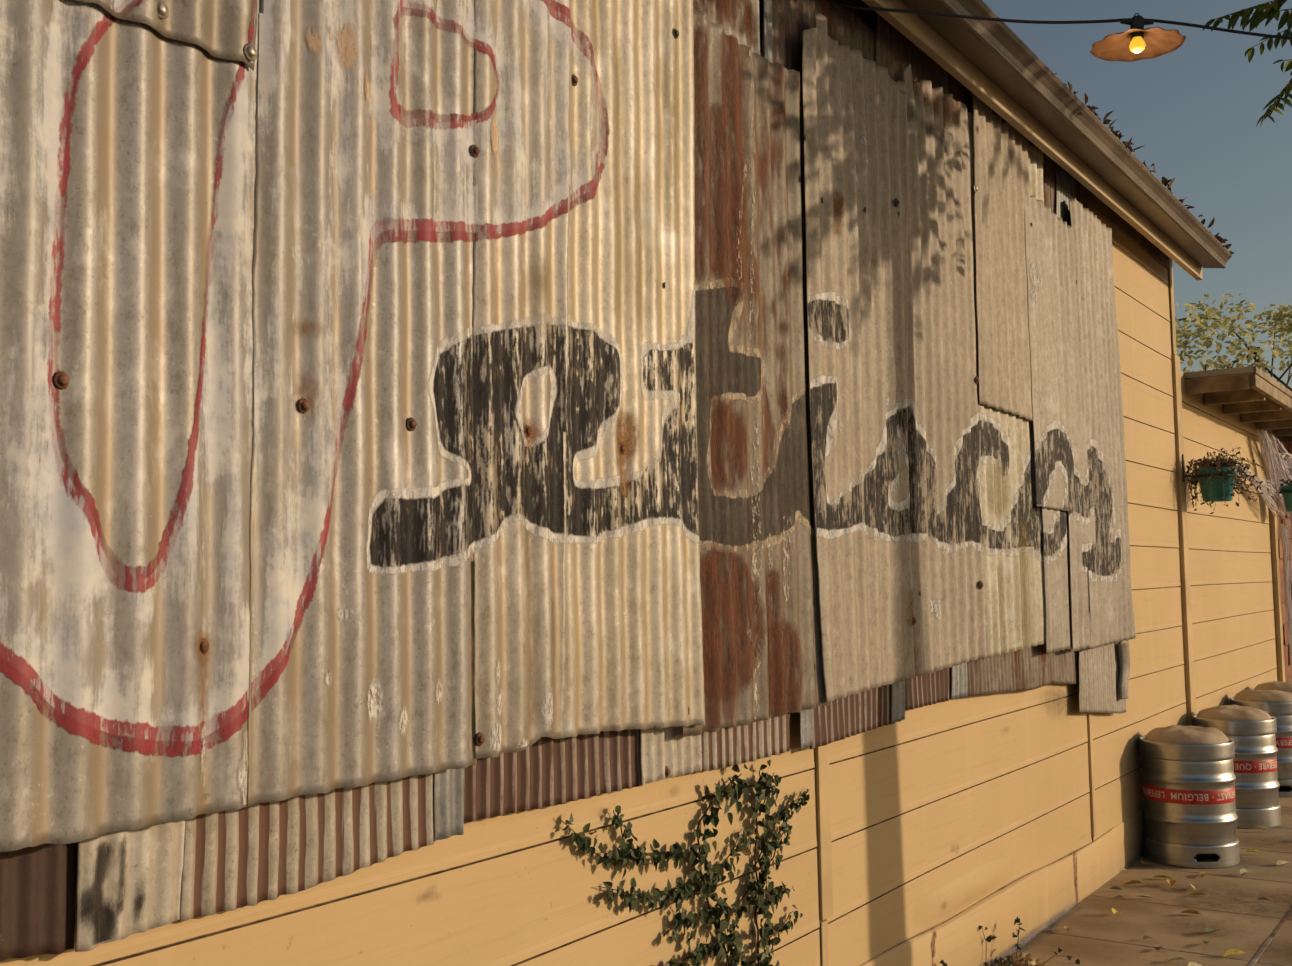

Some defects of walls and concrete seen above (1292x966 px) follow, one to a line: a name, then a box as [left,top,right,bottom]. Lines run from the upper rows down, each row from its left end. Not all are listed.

corrosion [693,0,754,301]
corrosion [618,416,637,496]
corrosion [700,549,801,729]